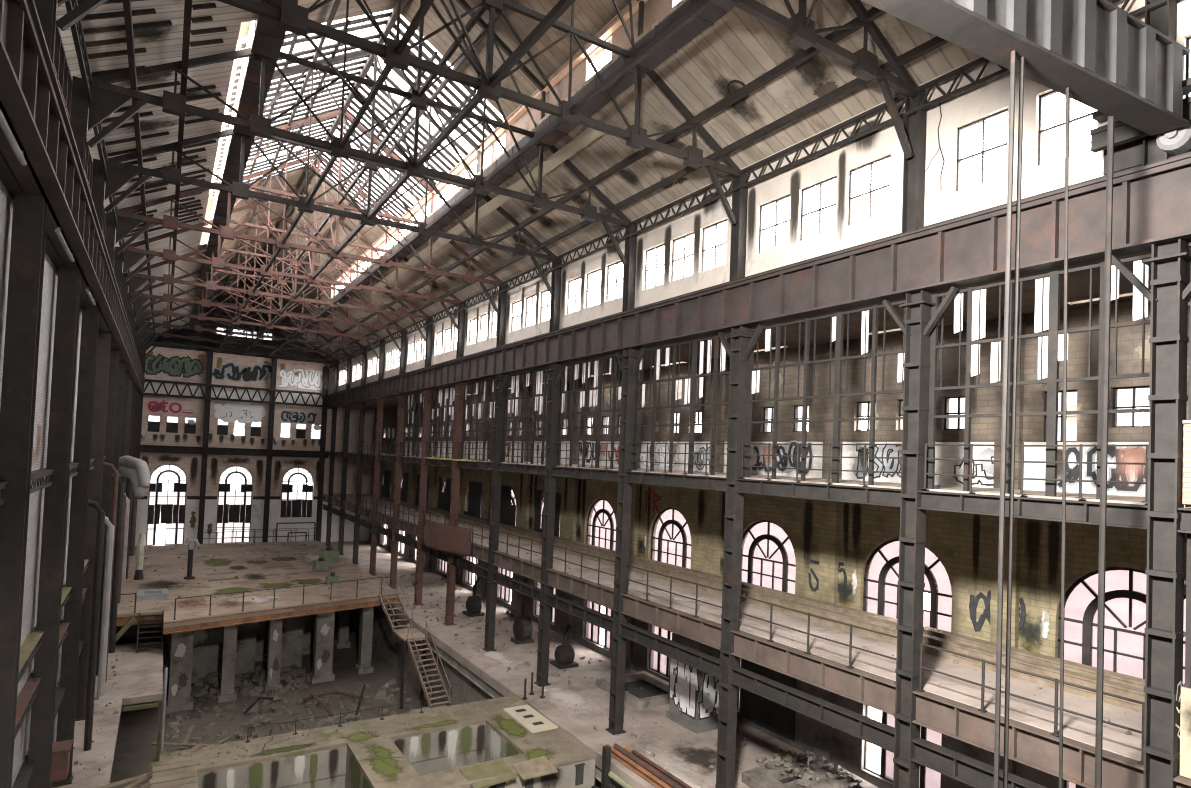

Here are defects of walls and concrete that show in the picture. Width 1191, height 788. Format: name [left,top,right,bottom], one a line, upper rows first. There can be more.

water stain [793,49,828,87]
water stain [718,80,754,118]
water stain [766,79,790,104]